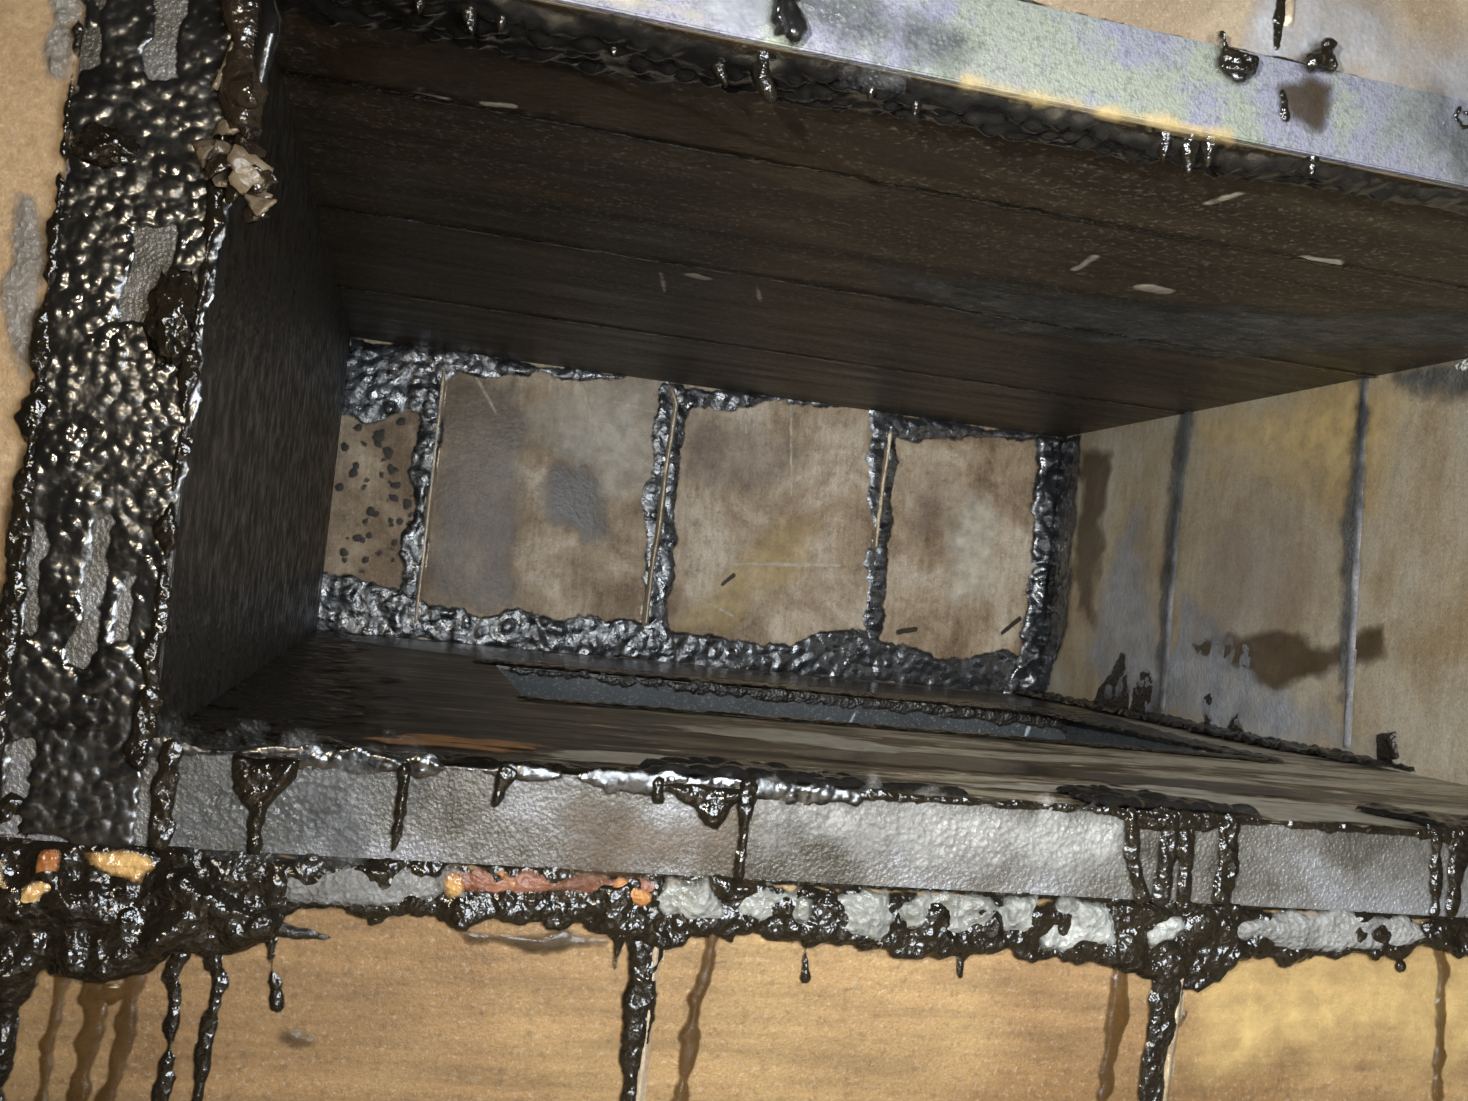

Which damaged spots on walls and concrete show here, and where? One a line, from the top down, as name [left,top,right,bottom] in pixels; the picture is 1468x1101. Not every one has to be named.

peeling [191,71,279,224]
damp [1091,411,1303,733]
rust [445,869,655,905]
damp [35,952,229,1101]
damp [265,936,285,1013]